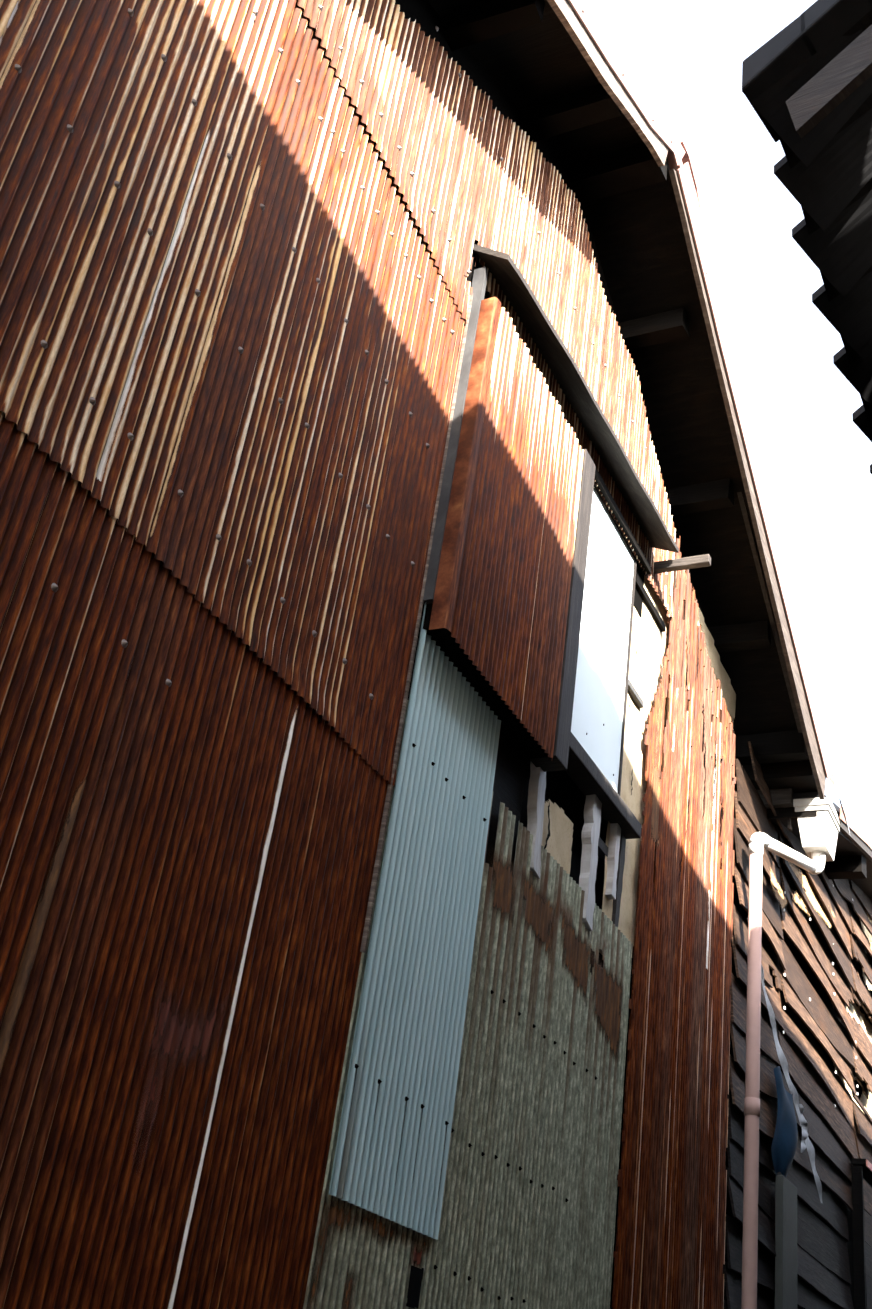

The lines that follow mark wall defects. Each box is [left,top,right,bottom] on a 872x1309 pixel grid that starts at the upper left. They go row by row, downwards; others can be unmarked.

flaking render [602,552,736,952]
flaking render [859,912,872,943]
flaking render [831,1002,872,1043]
flaking render [833,1063,872,1118]